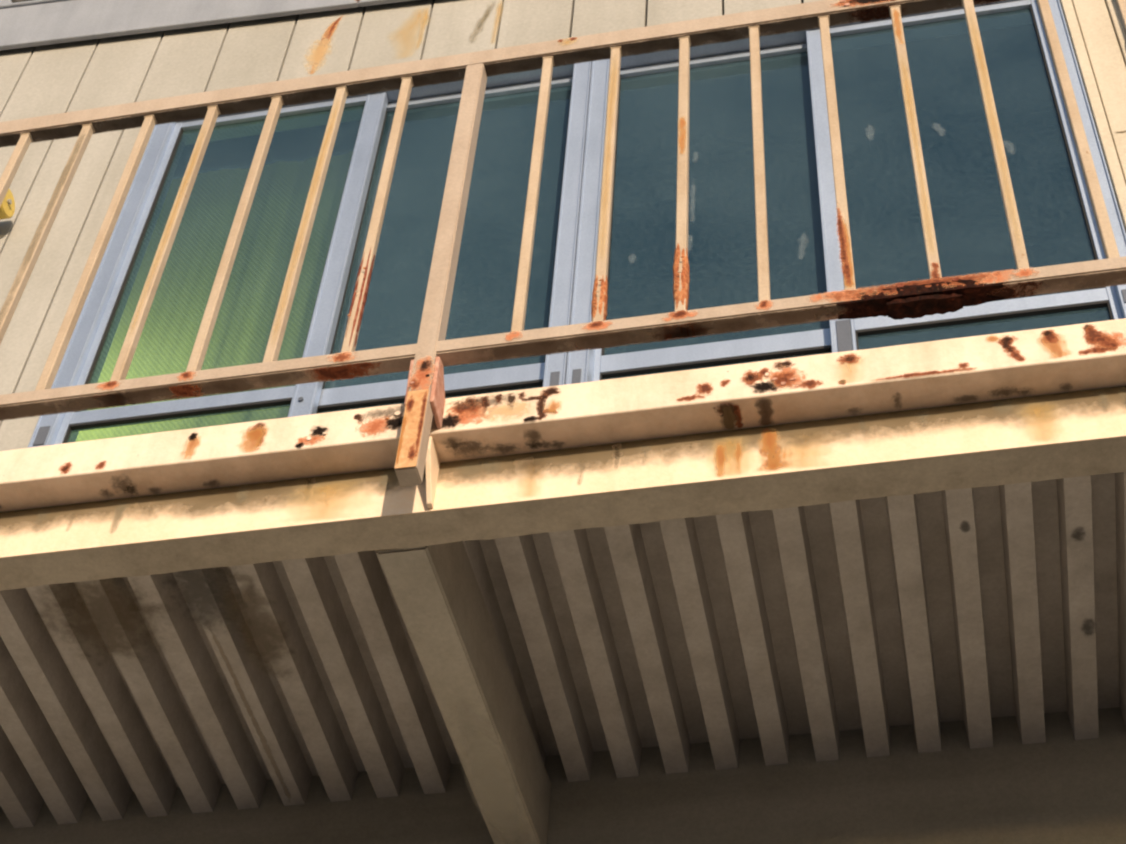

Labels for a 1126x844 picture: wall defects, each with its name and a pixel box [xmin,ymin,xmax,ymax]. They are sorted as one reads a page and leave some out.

rust [836,208,854,287]
rust [988,336,1025,361]
rust [1041,324,1126,358]
rust [677,379,730,401]
rust [185,433,199,457]
rust [243,423,266,452]
rust [394,356,435,469]
rust [449,392,525,424]
rust [714,403,743,429]
rust [755,399,786,469]
water stain [423,385,1126,480]
water stain [0,468,400,530]